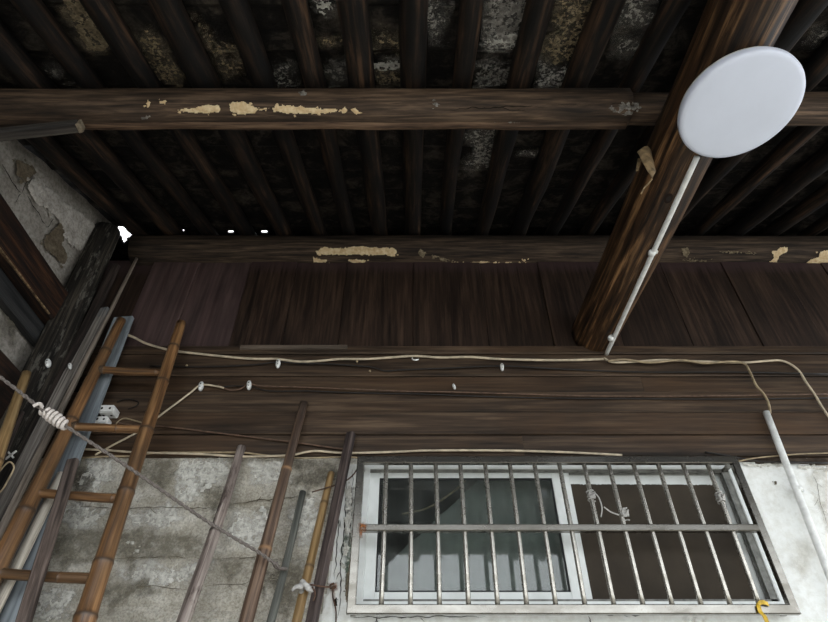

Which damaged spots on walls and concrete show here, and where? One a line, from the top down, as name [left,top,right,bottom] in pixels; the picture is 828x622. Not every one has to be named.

peeling [177,101,361,117]
peeling [609,102,642,116]
peeling [12,159,95,268]
peeling [313,246,398,263]
peeling [769,247,788,262]
peeling [807,250,828,263]
crack [334,476,485,622]